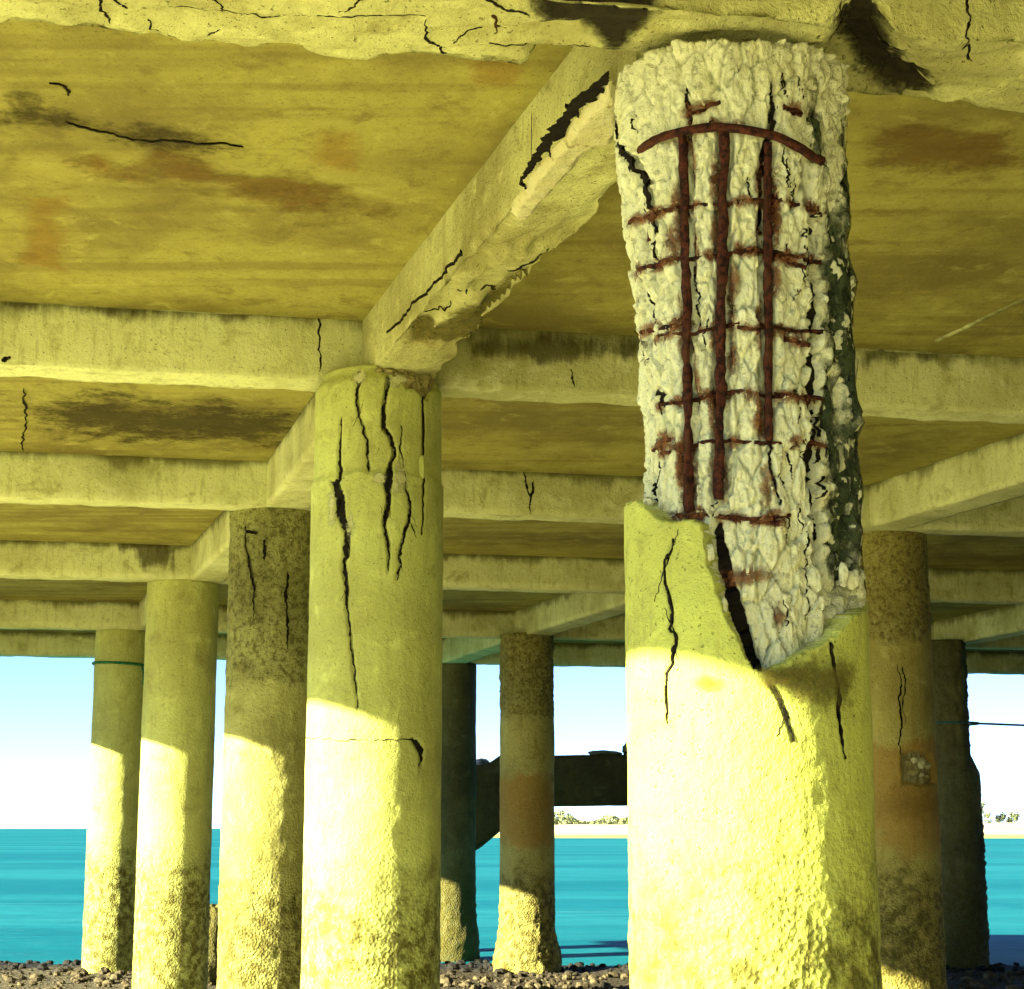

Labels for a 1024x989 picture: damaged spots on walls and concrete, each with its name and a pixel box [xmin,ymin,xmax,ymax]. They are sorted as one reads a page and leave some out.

crack [331,371,425,708]
spalling [409,265,533,342]
crack [519,71,610,190]
spalling [510,38,867,669]
corrosion [651,431,739,521]
corrosion [635,297,765,438]
corrosion [628,162,819,372]
crack [710,500,795,742]
crack [746,72,828,633]
leakage [818,120,858,358]
leakage [817,364,865,581]
leakage [834,0,936,93]